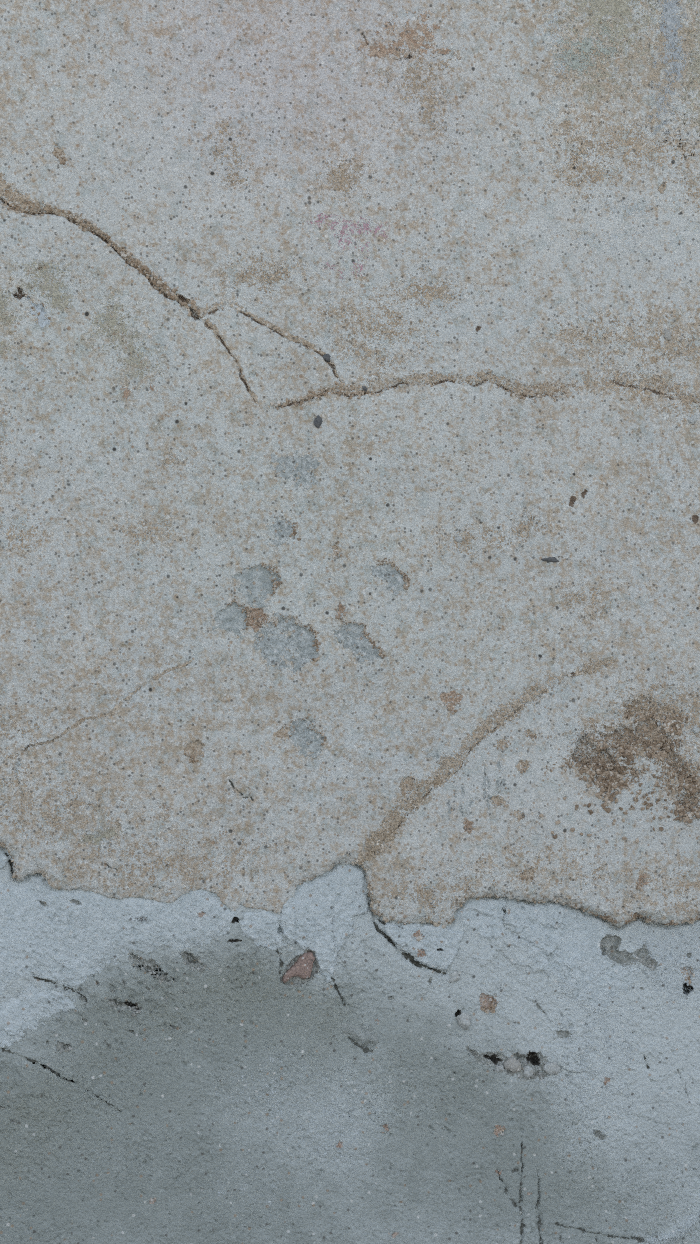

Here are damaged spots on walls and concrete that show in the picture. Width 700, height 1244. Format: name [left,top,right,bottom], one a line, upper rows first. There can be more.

crack [0,172,700,410]
spalling [212,562,385,673]
spalling [370,558,412,596]
spalling [490,669,700,843]
peeling [0,842,700,1048]
spalling [466,1046,551,1082]